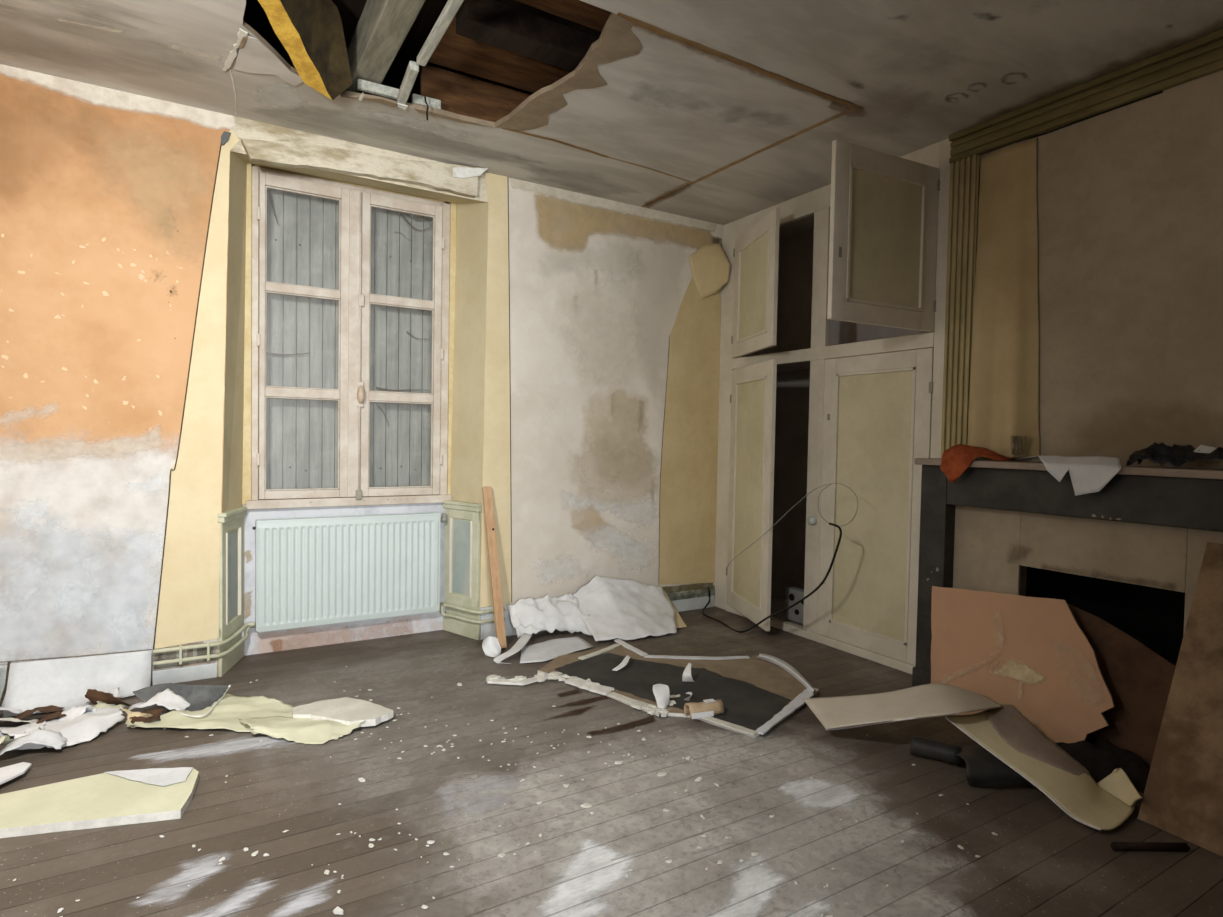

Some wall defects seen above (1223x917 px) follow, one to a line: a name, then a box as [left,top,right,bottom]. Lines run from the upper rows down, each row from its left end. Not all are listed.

peeling [223,28,248,71]
peeling [340,93,493,127]
peeling [510,178,716,231]
water stain [0,534,158,654]